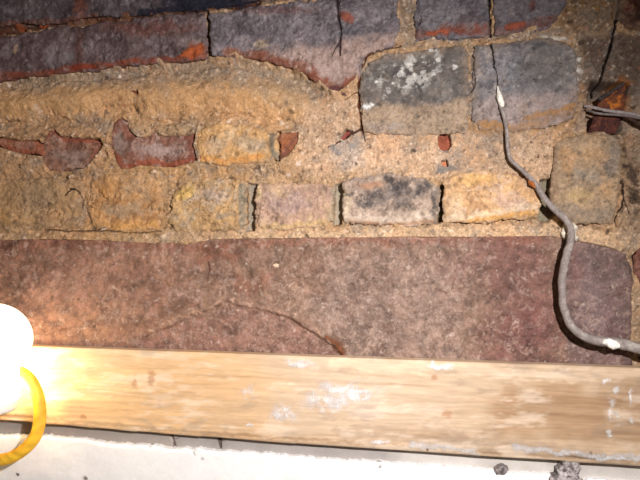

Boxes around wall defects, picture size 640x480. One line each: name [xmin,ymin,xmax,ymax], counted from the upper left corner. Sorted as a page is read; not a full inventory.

crack [332,0,342,56]
crack [328,52,376,147]
damp [392,56,436,88]
crack [590,0,618,99]